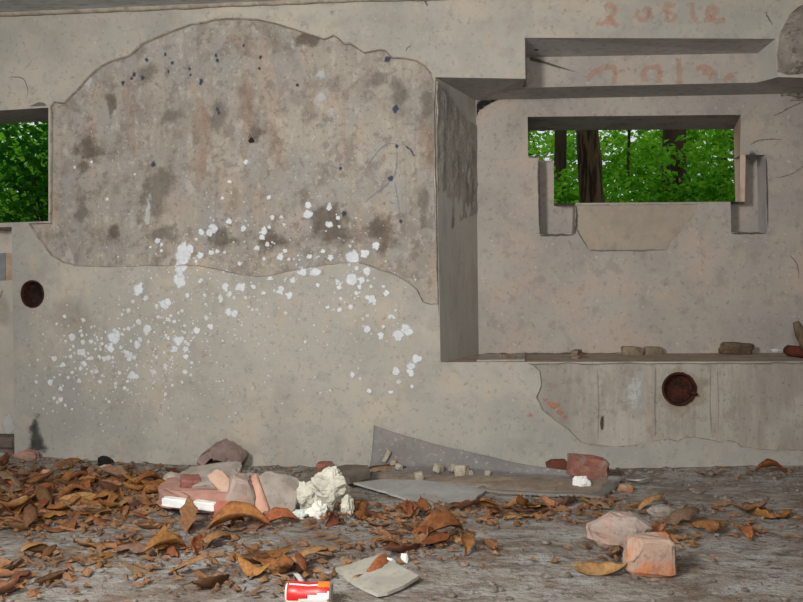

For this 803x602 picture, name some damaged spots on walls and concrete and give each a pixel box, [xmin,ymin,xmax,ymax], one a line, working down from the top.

spalling [28,17,497,305]
spalling [477,354,803,452]